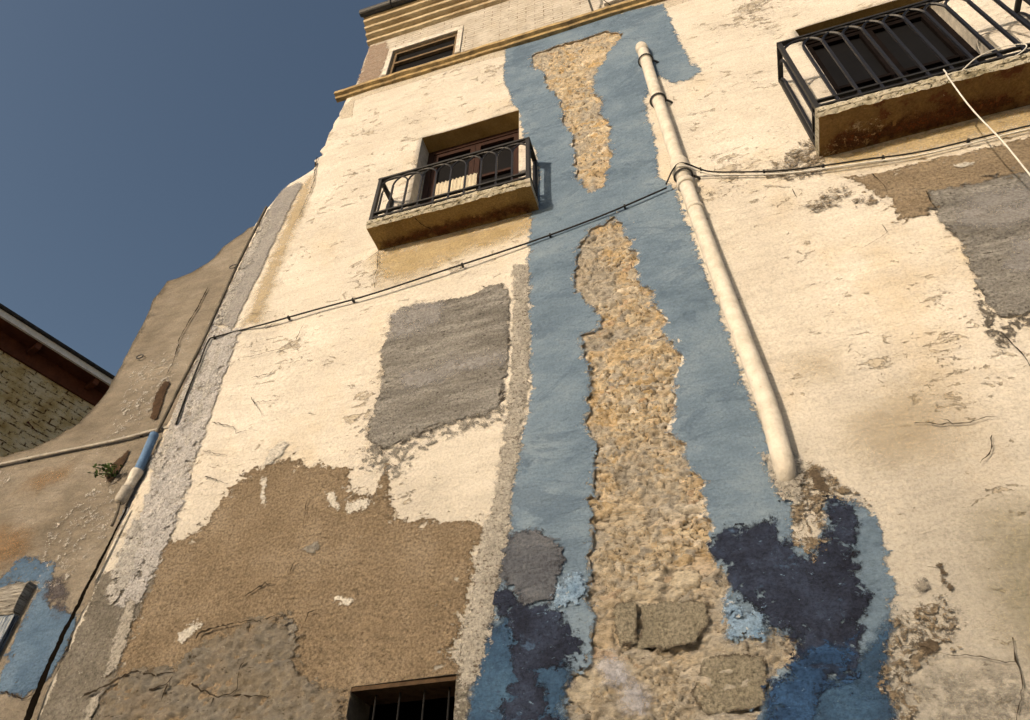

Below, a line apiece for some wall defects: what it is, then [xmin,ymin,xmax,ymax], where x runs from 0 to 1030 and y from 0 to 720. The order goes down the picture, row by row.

spalling [532,33,622,193]
corrosion [830,96,1018,153]
spalling [550,218,799,720]
crack [84,662,271,707]
peeling [82,441,489,720]
peeling [870,563,966,720]
crack [900,637,1023,720]